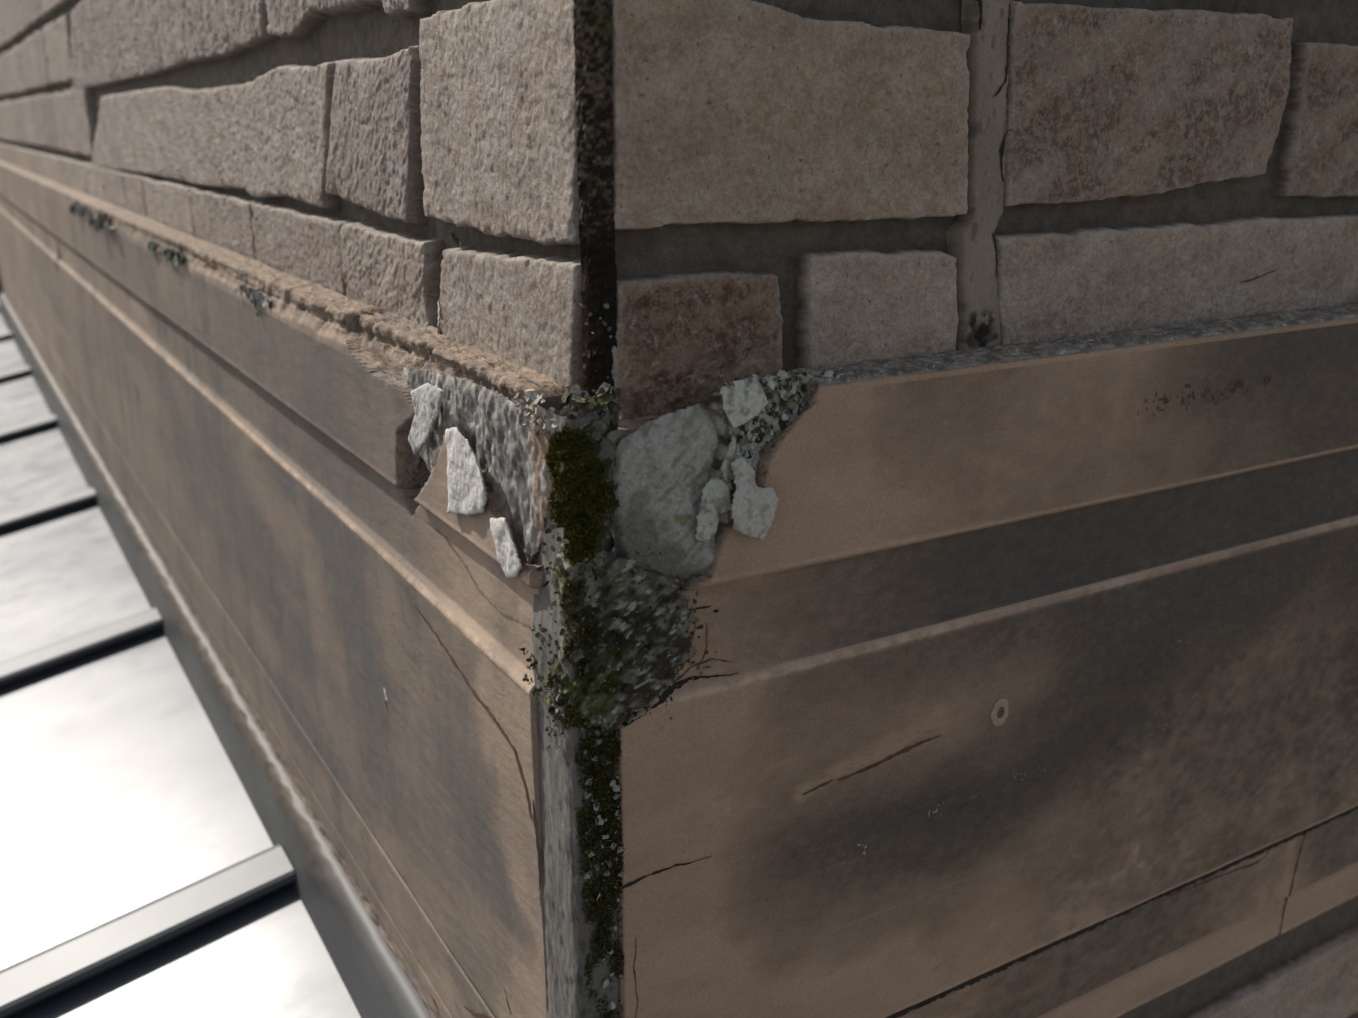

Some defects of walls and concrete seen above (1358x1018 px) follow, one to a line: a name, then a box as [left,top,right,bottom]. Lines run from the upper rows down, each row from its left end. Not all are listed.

damp [969,314,997,347]
spalling [377,366,859,754]
damp [789,323,1358,885]
crack [413,603,541,906]
crack [632,939,640,1018]
crack [622,856,711,889]
crack [886,806,1358,1018]